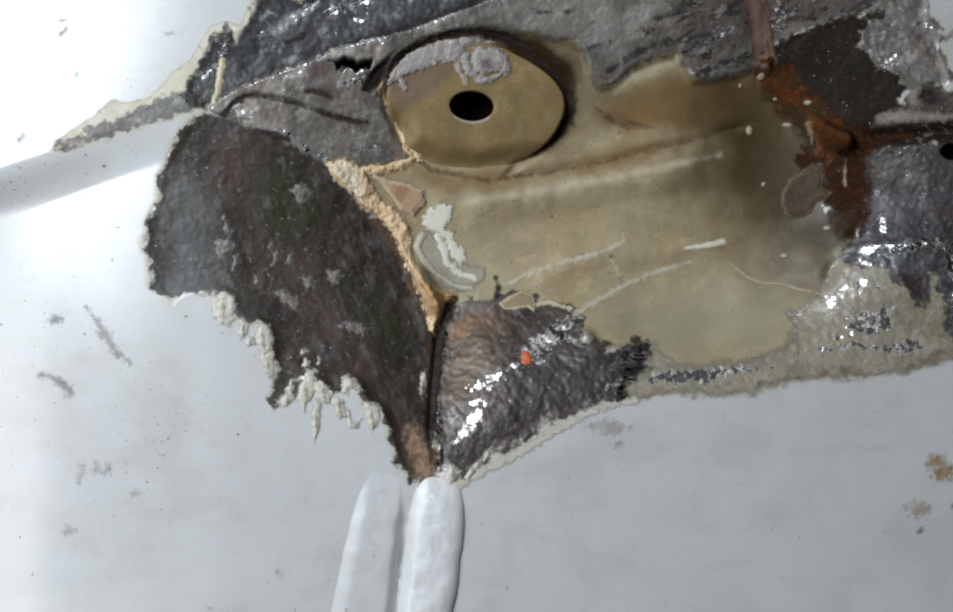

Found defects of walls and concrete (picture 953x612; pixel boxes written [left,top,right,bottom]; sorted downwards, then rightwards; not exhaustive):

peeling [54,0,953,489]
rust [743,0,915,236]